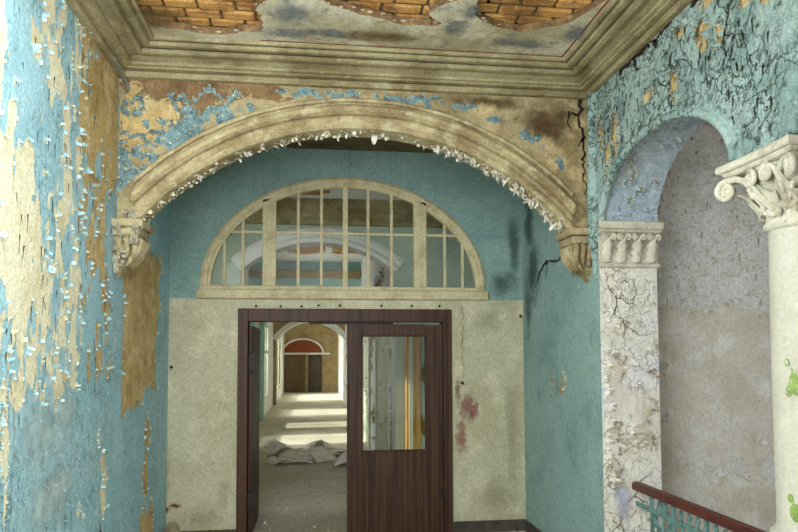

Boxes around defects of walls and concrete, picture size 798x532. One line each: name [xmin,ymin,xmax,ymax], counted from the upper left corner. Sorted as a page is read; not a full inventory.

spalling [327,0,437,23]
spalling [476,0,597,26]
peeling [374,92,478,111]
crack [567,0,772,199]
peeling [143,128,566,239]
peeling [0,0,360,532]
crack [535,257,561,294]
peeling [595,0,785,532]
crack [606,283,653,359]
peeling [363,337,392,450]
peeling [784,358,798,398]
peeling [788,494,798,523]